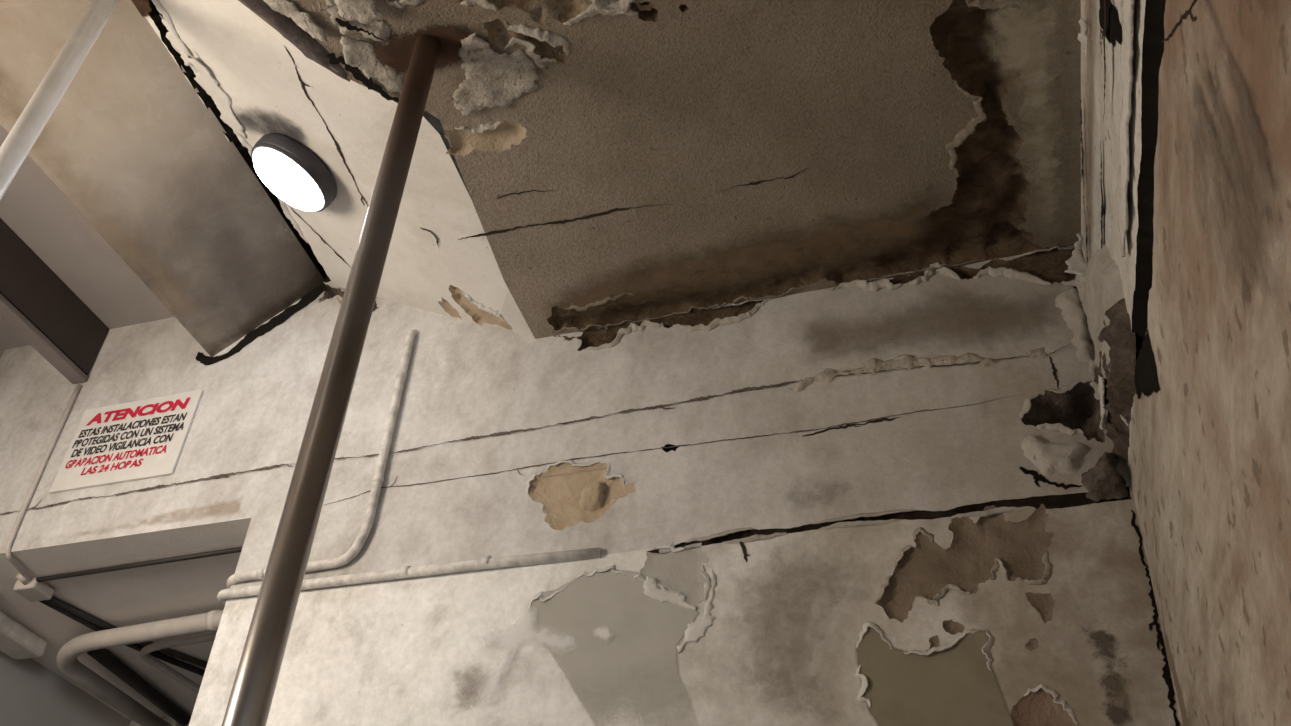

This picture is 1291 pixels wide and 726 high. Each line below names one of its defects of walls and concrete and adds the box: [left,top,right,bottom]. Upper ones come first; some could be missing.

crack [0,463,295,515]
peeling [152,0,253,156]
peeling [263,0,425,93]
crack [325,344,1070,505]
water stain [555,189,930,316]
crack [718,168,810,193]
water stain [809,300,1041,351]
water stain [990,1,1064,230]
crack [1019,466,1081,490]
spalling [1019,298,1136,502]
peeling [527,527,788,718]
peeling [855,504,1079,726]